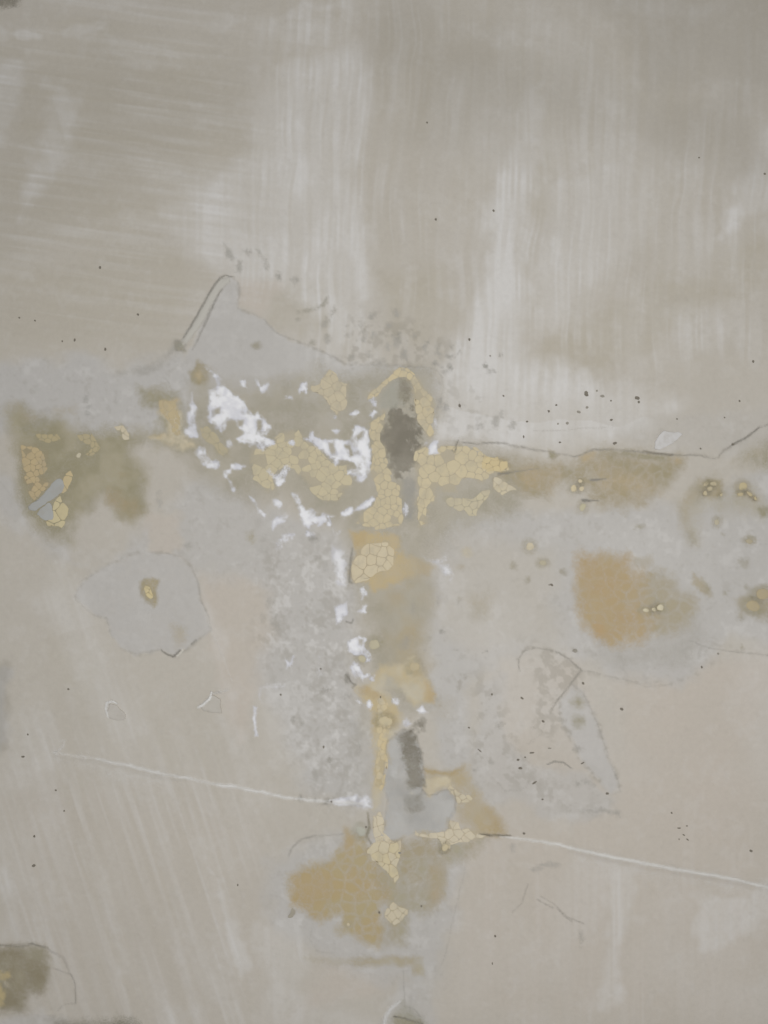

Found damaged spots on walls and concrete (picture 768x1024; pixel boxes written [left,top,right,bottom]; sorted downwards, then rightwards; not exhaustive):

peeling [18,432,73,528]
peeling [248,430,354,503]
peeling [351,366,520,583]
crack [452,425,767,475]
water stain [0,309,541,810]
crack [52,739,372,843]
peeling [365,811,403,883]
peeling [414,817,487,852]
crack [479,832,768,904]